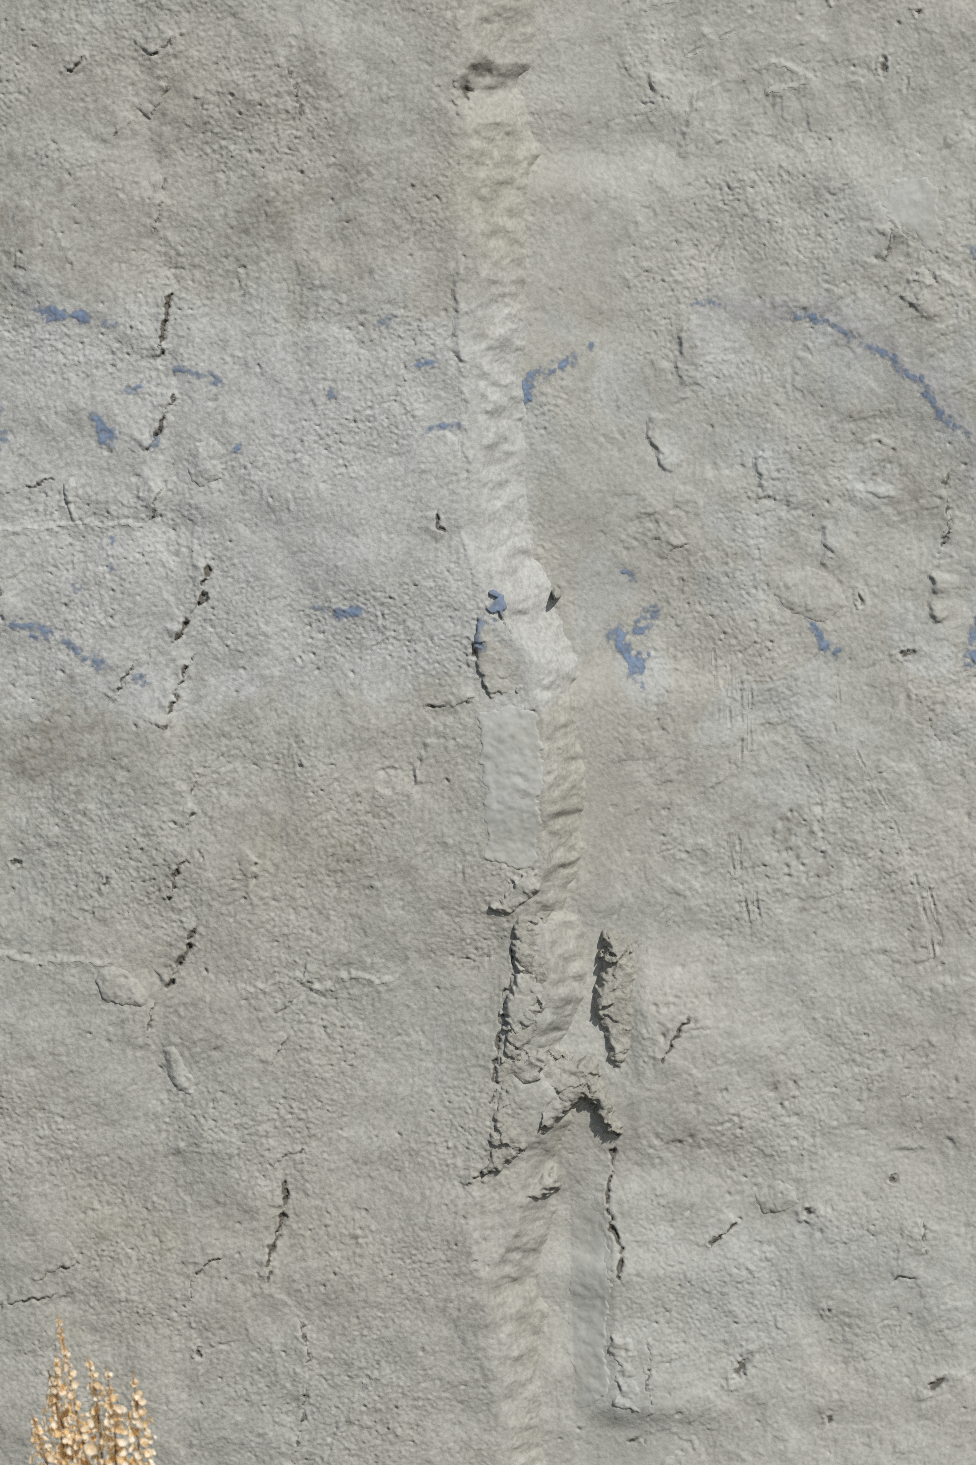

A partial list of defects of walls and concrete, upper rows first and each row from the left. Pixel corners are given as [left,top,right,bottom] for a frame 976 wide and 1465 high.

crack [157,293,173,357]
crack [147,394,175,450]
crack [164,565,211,729]
crack [168,862,183,901]
crack [147,928,196,1030]
crack [489,950,513,1104]
spalling [489,870,559,1064]
crack [266,1149,302,1282]
peeling [525,1164,562,1200]
crack [605,1134,624,1280]